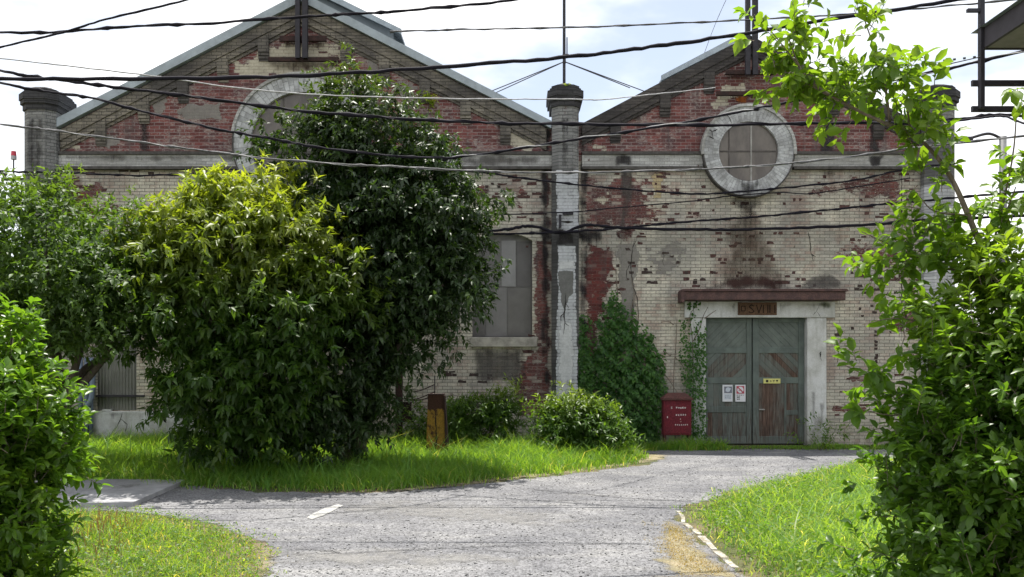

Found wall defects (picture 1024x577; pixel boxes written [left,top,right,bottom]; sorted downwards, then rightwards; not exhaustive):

damp [724,276,780,289]
damp [803,276,839,288]
peeling [471,170,715,418]
damp [478,351,521,383]
spalling [443,371,487,383]